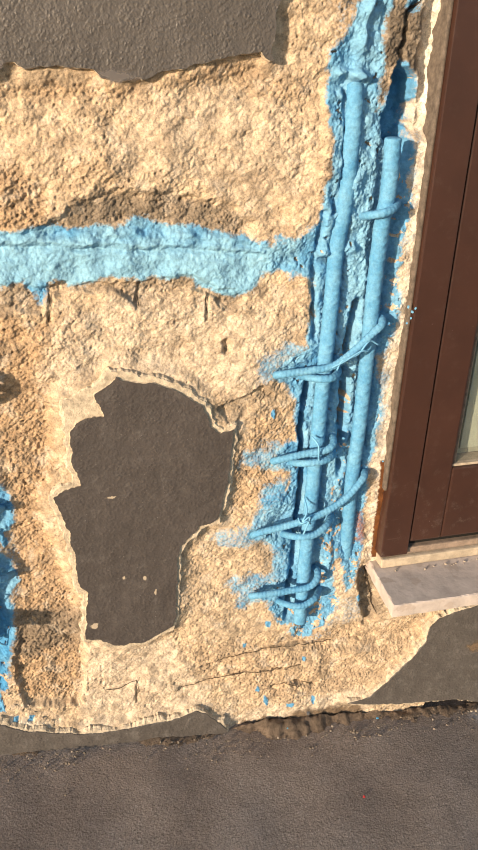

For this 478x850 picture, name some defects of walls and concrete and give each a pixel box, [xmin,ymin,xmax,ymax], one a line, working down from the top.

spalling [0,0,442,731]
crack [399,0,421,62]